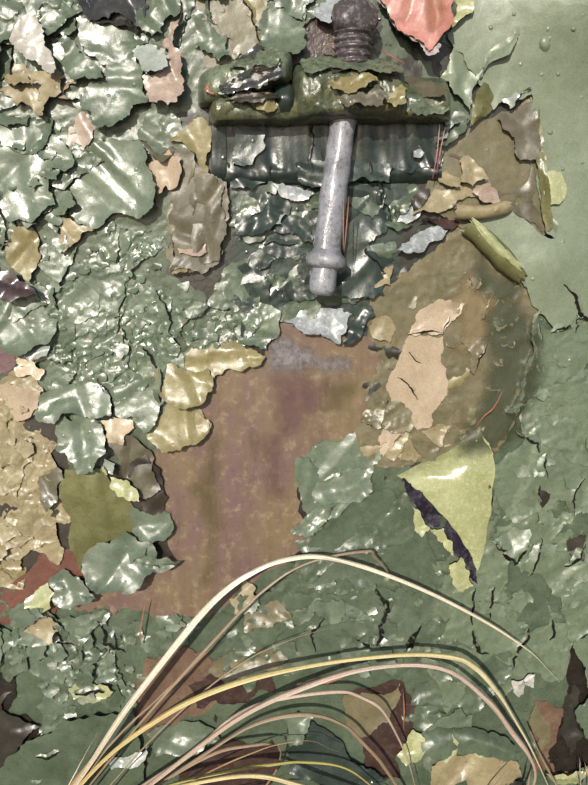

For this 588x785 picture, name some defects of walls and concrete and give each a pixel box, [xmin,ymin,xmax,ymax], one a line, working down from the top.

rust [425,0,441,29]
peeling [0,0,229,615]
crack [532,284,588,340]
peeling [193,0,588,785]
crack [515,431,548,502]
peeling [0,220,515,785]
crack [566,478,585,517]
crack [491,537,543,577]
crack [564,544,586,567]